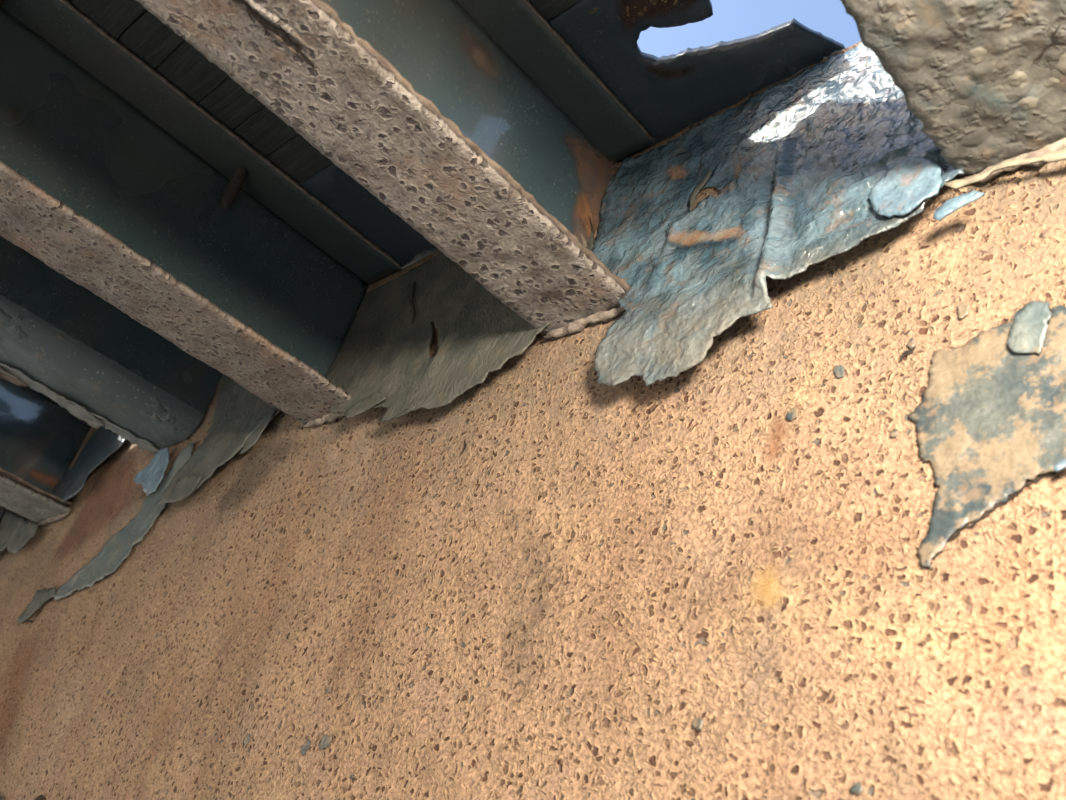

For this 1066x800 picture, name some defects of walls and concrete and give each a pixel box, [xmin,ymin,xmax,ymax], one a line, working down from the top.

peeling [16,374,281,625]
crack [232,0,316,69]
peeling [325,253,550,422]
corrosion [312,0,631,291]
peeling [587,43,1066,387]
peeling [908,300,1066,569]